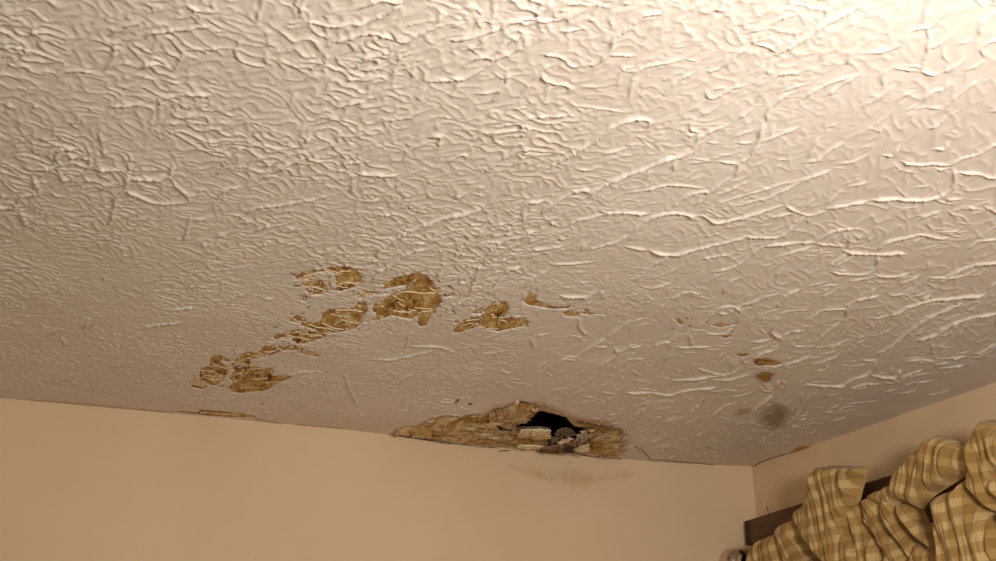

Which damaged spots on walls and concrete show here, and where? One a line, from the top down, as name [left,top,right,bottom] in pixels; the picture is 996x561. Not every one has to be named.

peeling [189,266,462,393]
peeling [453,300,532,332]
peeling [523,291,597,316]
peeling [175,410,256,418]
spalling [394,400,626,459]